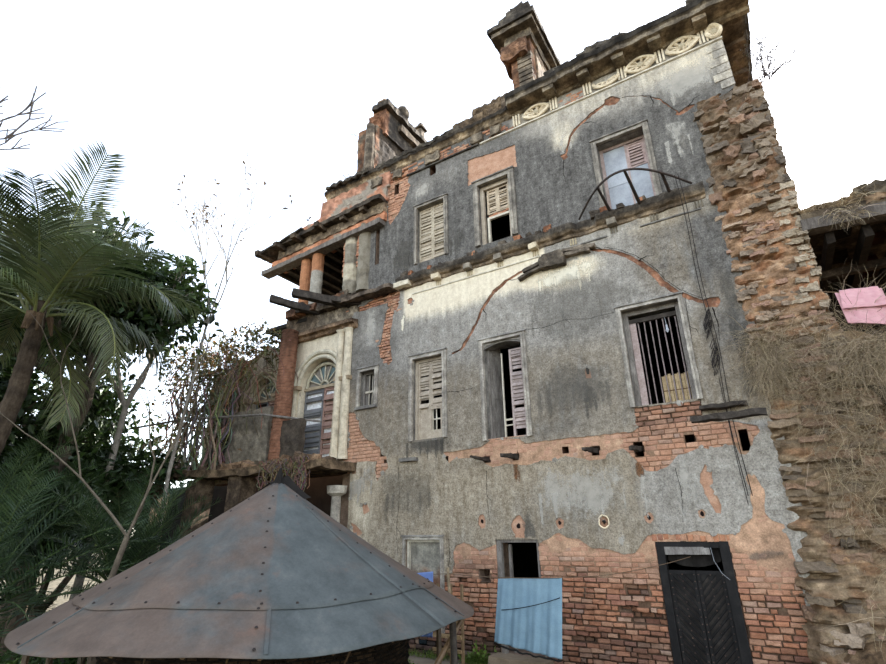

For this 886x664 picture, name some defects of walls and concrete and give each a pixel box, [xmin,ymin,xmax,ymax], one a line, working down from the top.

flaking render [387,161,424,225]
flaking render [440,144,470,160]
flaking render [466,145,517,186]
crack [561,96,696,180]
flaking render [346,291,414,366]
crack [451,271,522,355]
crack [590,247,720,340]
flaking render [343,412,388,481]
flaking render [442,400,760,471]
flaking render [408,542,501,660]
flaking render [538,464,812,664]